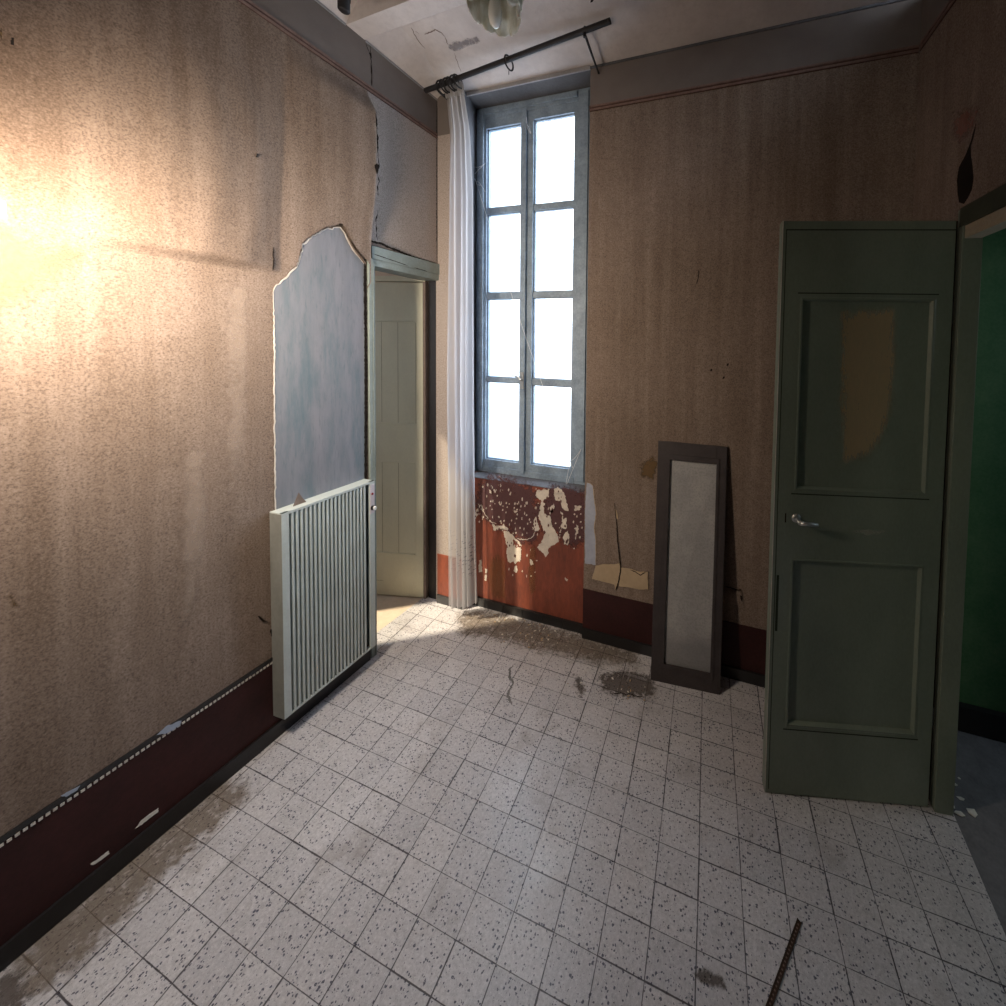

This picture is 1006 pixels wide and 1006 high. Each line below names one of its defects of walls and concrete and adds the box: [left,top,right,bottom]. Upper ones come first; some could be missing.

crack [366,45,375,87]
crack [371,116,380,240]
peeling [273,227,366,510]
peeling [475,483,596,577]
leakage [460,612,656,697]